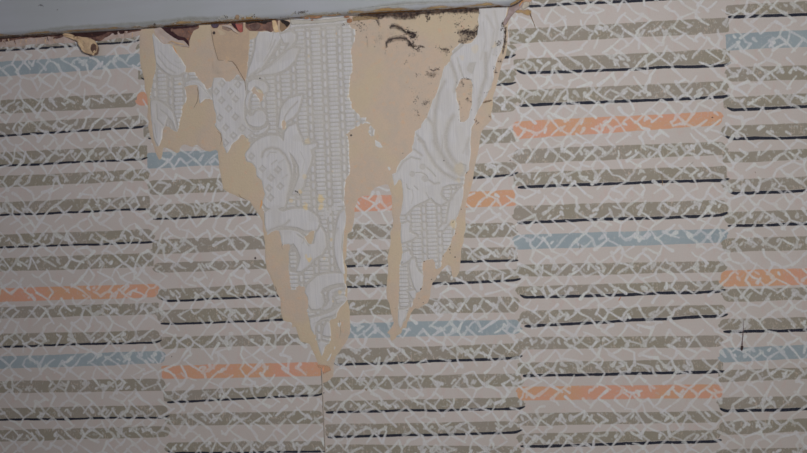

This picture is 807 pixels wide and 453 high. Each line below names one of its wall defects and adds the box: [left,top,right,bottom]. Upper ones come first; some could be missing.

leakage [147,17,290,46]
peeling [214,2,432,32]
leakage [305,3,500,64]